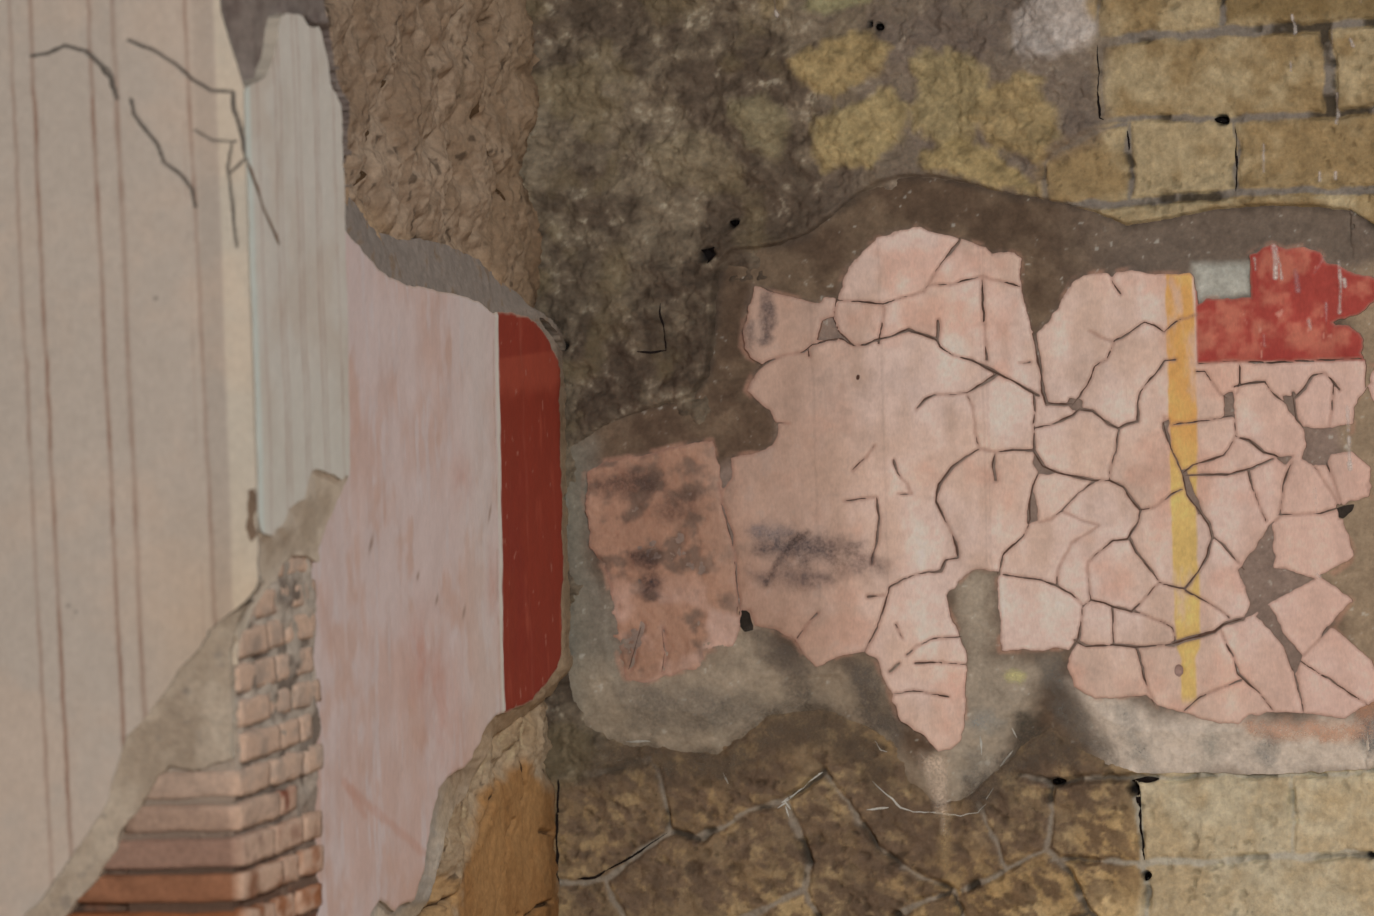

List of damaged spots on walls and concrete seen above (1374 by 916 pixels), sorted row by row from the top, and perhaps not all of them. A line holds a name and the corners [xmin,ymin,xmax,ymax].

crack [31,44,196,207]
crack [128,40,280,244]
flaking render [1020,256,1070,327]
flaking render [1195,266,1248,300]
flaking render [721,396,773,462]
flaking render [1303,427,1351,464]
crack [813,300,1340,711]
flaking render [1239,522,1310,609]
flaking render [948,572,998,652]
crack [526,779,667,914]
water stain [924,756,950,845]
crack [1132,776,1159,860]